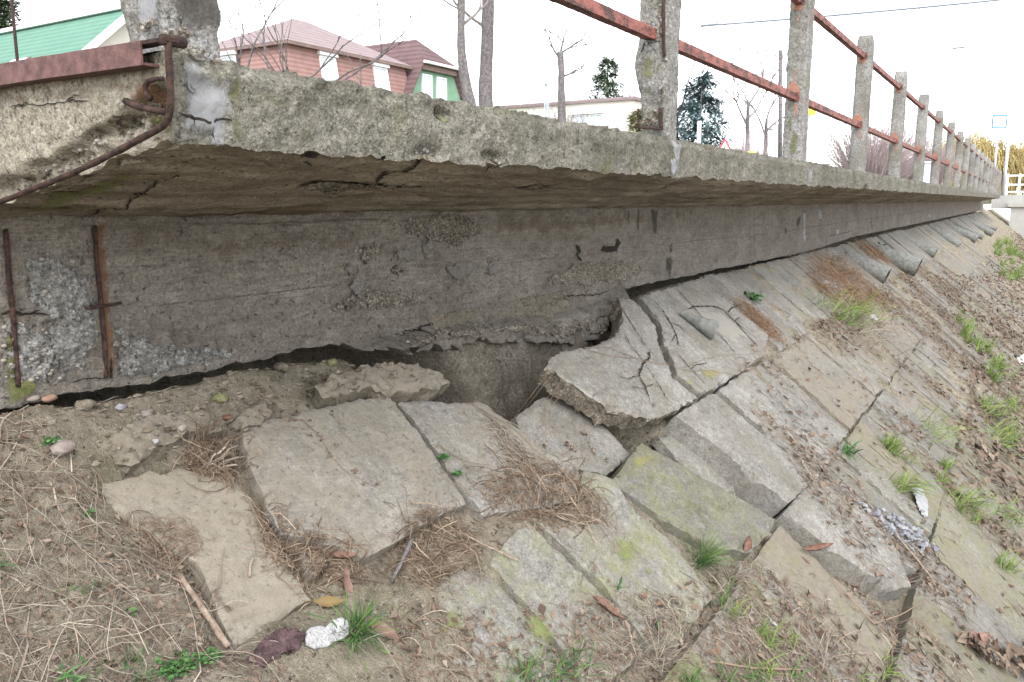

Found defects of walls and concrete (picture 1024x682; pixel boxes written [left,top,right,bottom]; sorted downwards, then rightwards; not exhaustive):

crack [301,153,318,167]
crack [85,173,191,217]
spalling [0,225,235,387]
crack [396,323,437,339]
crack [554,292,760,403]
crack [71,359,113,383]